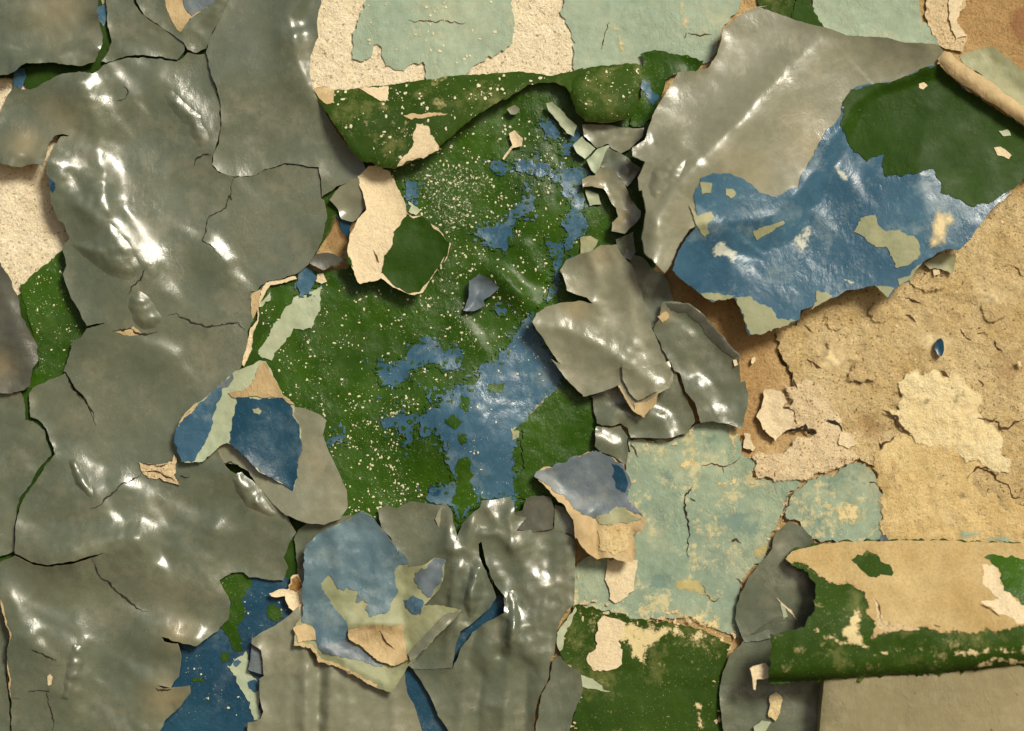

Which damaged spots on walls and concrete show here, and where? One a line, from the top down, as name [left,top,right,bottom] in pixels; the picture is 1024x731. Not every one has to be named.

peeling [994,129,1011,159]
crack [112,313,245,336]
crack [202,178,234,255]
peeling [310,166,451,295]
peeling [532,102,756,430]
crack [90,476,139,509]
peeling [174,360,348,525]
peeling [515,426,647,562]
crack [683,436,753,556]
spalling [752,378,859,482]
crack [92,561,144,612]
crack [0,599,54,731]